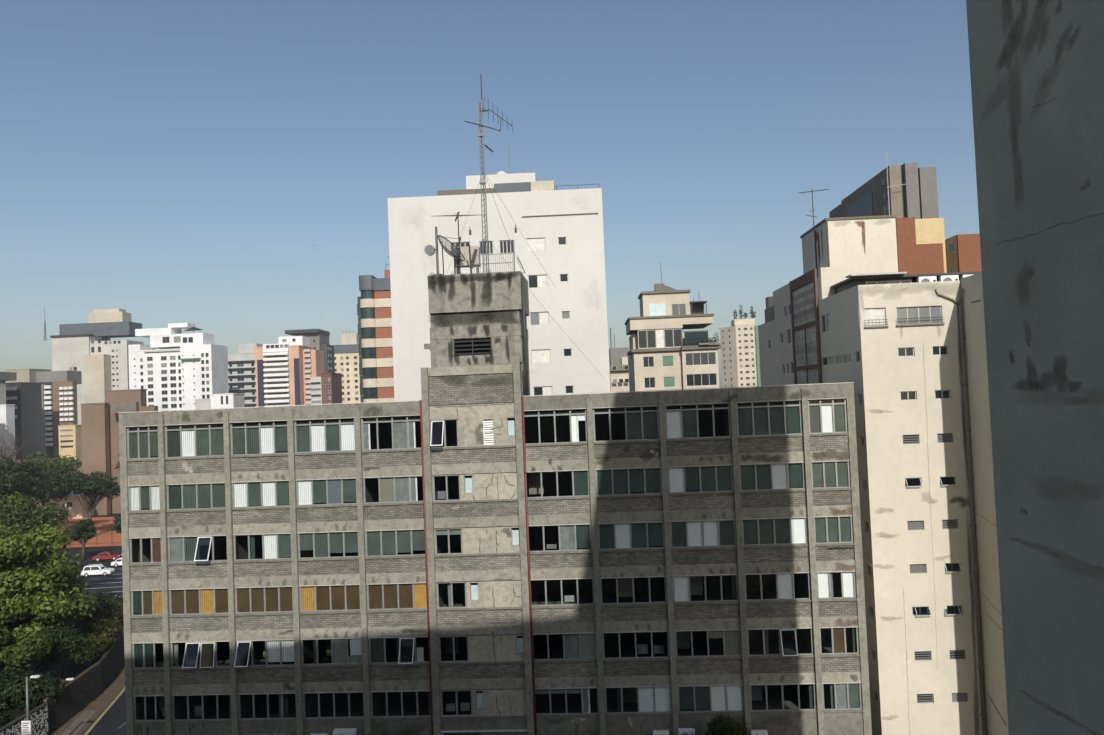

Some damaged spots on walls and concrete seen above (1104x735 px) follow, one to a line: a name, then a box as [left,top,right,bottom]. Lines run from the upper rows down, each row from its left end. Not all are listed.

water stain [428,272,515,364]